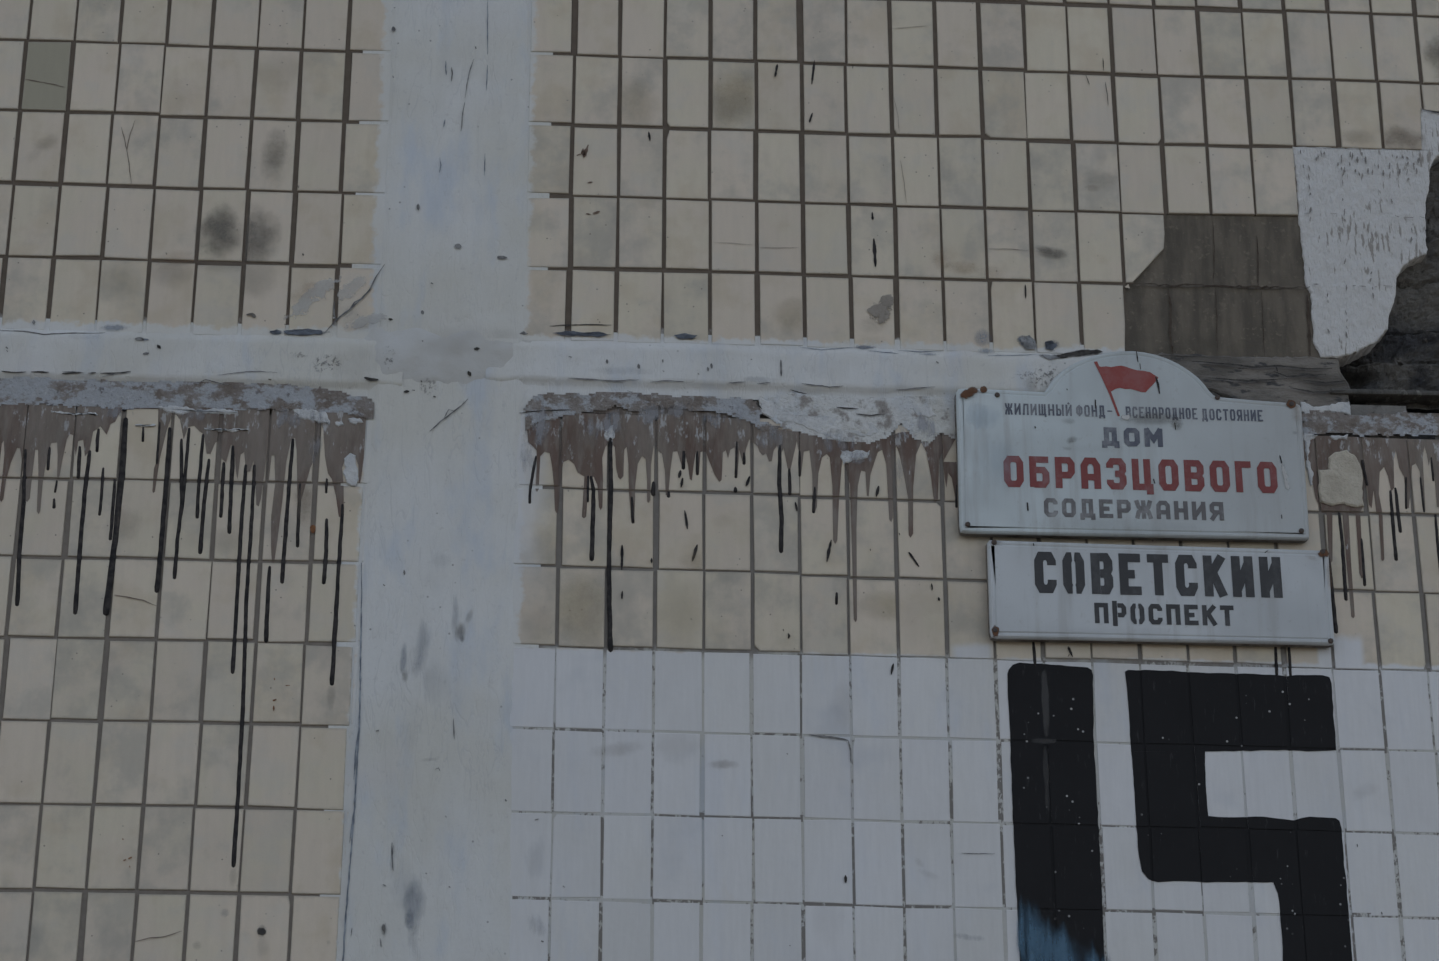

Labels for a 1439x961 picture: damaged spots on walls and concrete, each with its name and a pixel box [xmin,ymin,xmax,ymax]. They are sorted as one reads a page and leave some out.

peeling [0,377,378,432]
peeling [343,453,359,487]
damp [528,437,750,652]
damp [767,445,958,622]
peeling [1021,335,1102,360]
peeling [1125,110,1439,486]
damp [1312,457,1439,634]
damp [0,417,364,868]